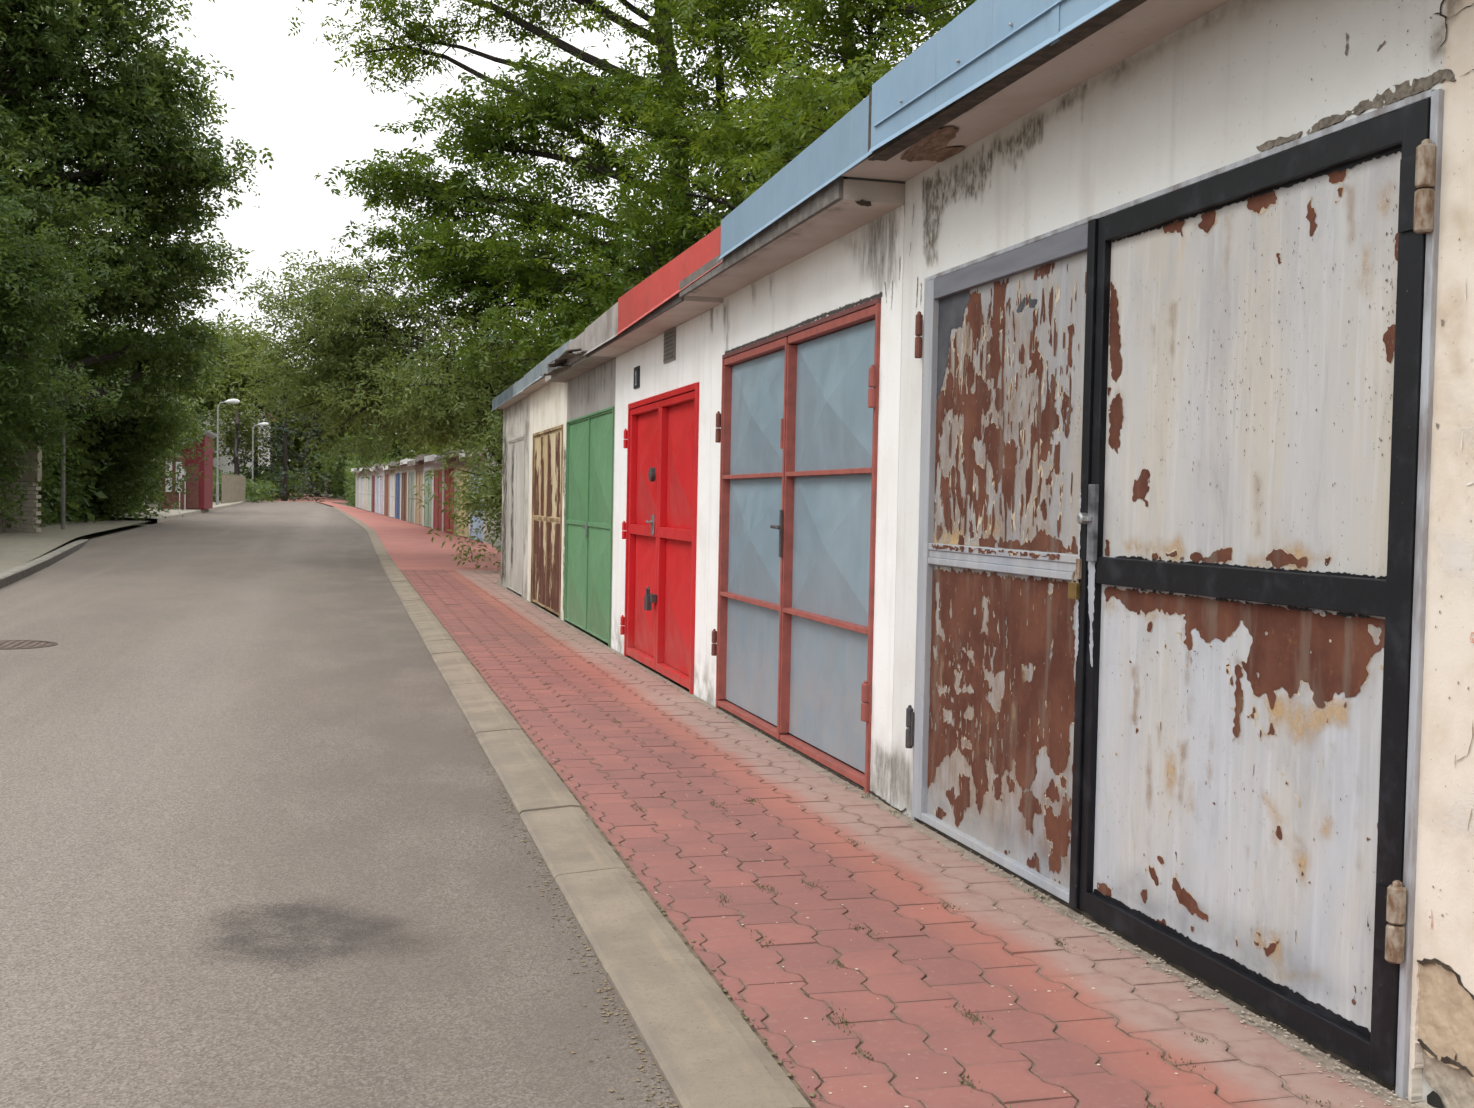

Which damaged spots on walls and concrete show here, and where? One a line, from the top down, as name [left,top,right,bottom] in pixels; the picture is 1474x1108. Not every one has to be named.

crack [1435,0,1474,48]
leakage [868,117,1042,306]
corrosion [1108,282,1124,454]
corrosion [1187,197,1317,463]
peeling [1256,131,1303,151]
corrosion [1348,186,1399,373]
corrosion [927,263,1087,884]
corrosion [1132,458,1163,507]
corrosion [1152,522,1233,564]
corrosion [1104,586,1385,808]
corrosion [1120,842,1253,933]
spalling [1418,961,1474,1108]